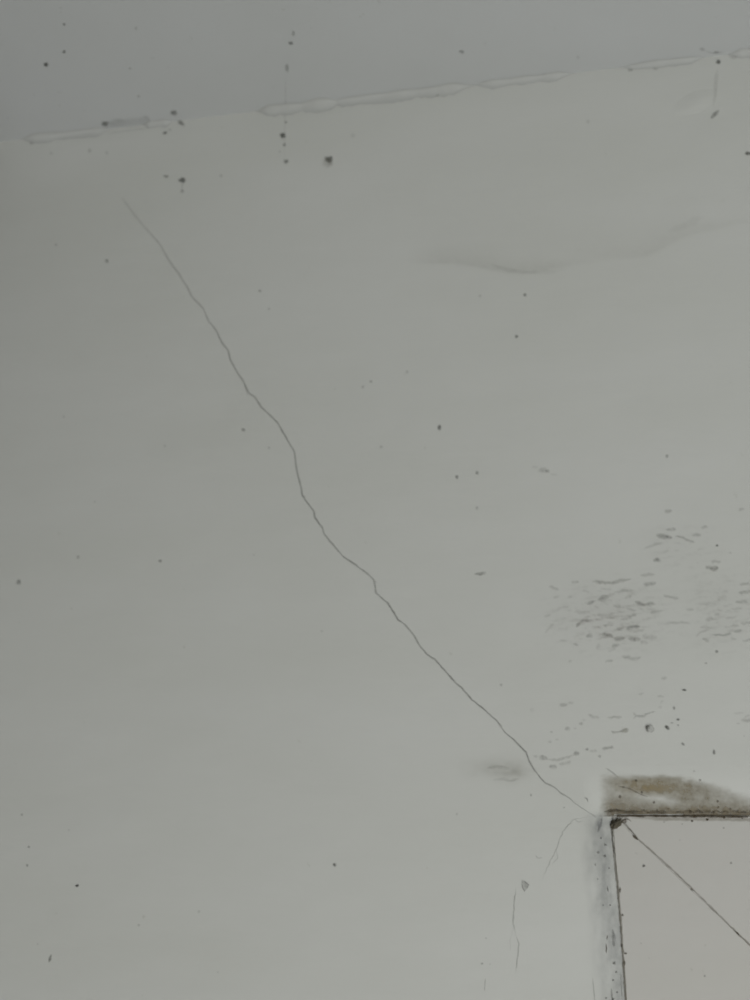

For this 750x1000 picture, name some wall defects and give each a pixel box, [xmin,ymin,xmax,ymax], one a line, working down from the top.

leakage [607,779,750,817]